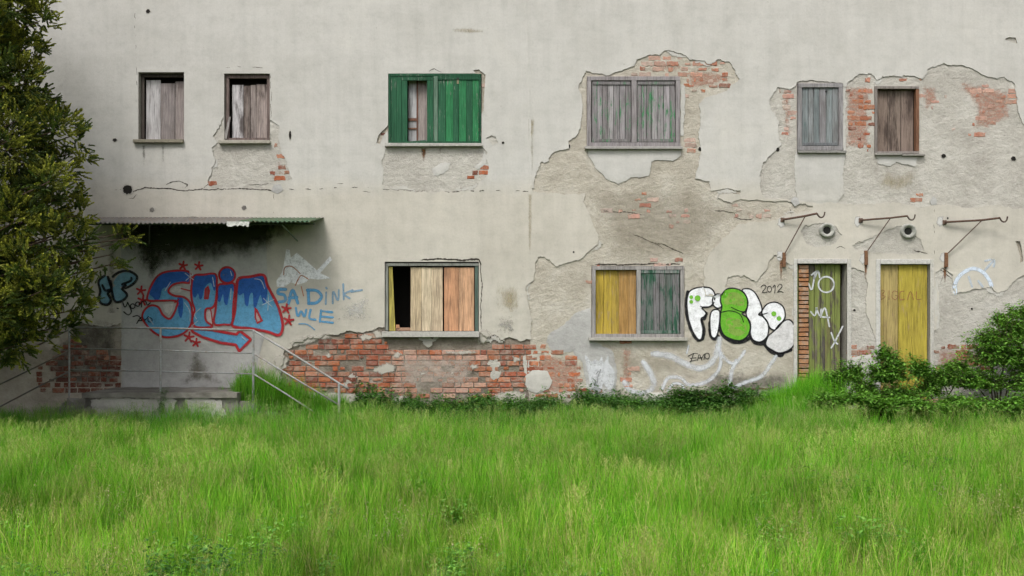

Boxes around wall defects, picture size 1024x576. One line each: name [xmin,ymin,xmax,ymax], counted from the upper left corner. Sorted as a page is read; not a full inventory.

peeling [208,117,292,189]
crack [132,181,419,213]
peeling [274,50,1024,406]
spalling [0,323,226,424]